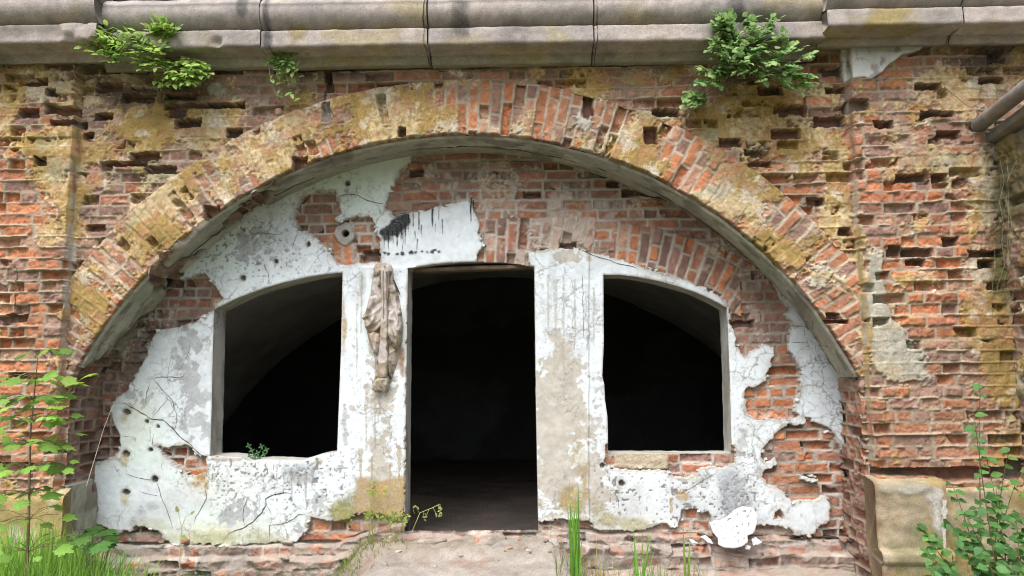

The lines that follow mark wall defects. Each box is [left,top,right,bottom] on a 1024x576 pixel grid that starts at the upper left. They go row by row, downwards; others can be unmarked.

flaking render [66,130,309,475]
flaking render [296,193,381,265]
water stain [384,209,443,249]
flaking render [386,153,845,522]
flaking render [699,46,1014,377]
crack [112,339,207,528]
crack [222,492,303,544]